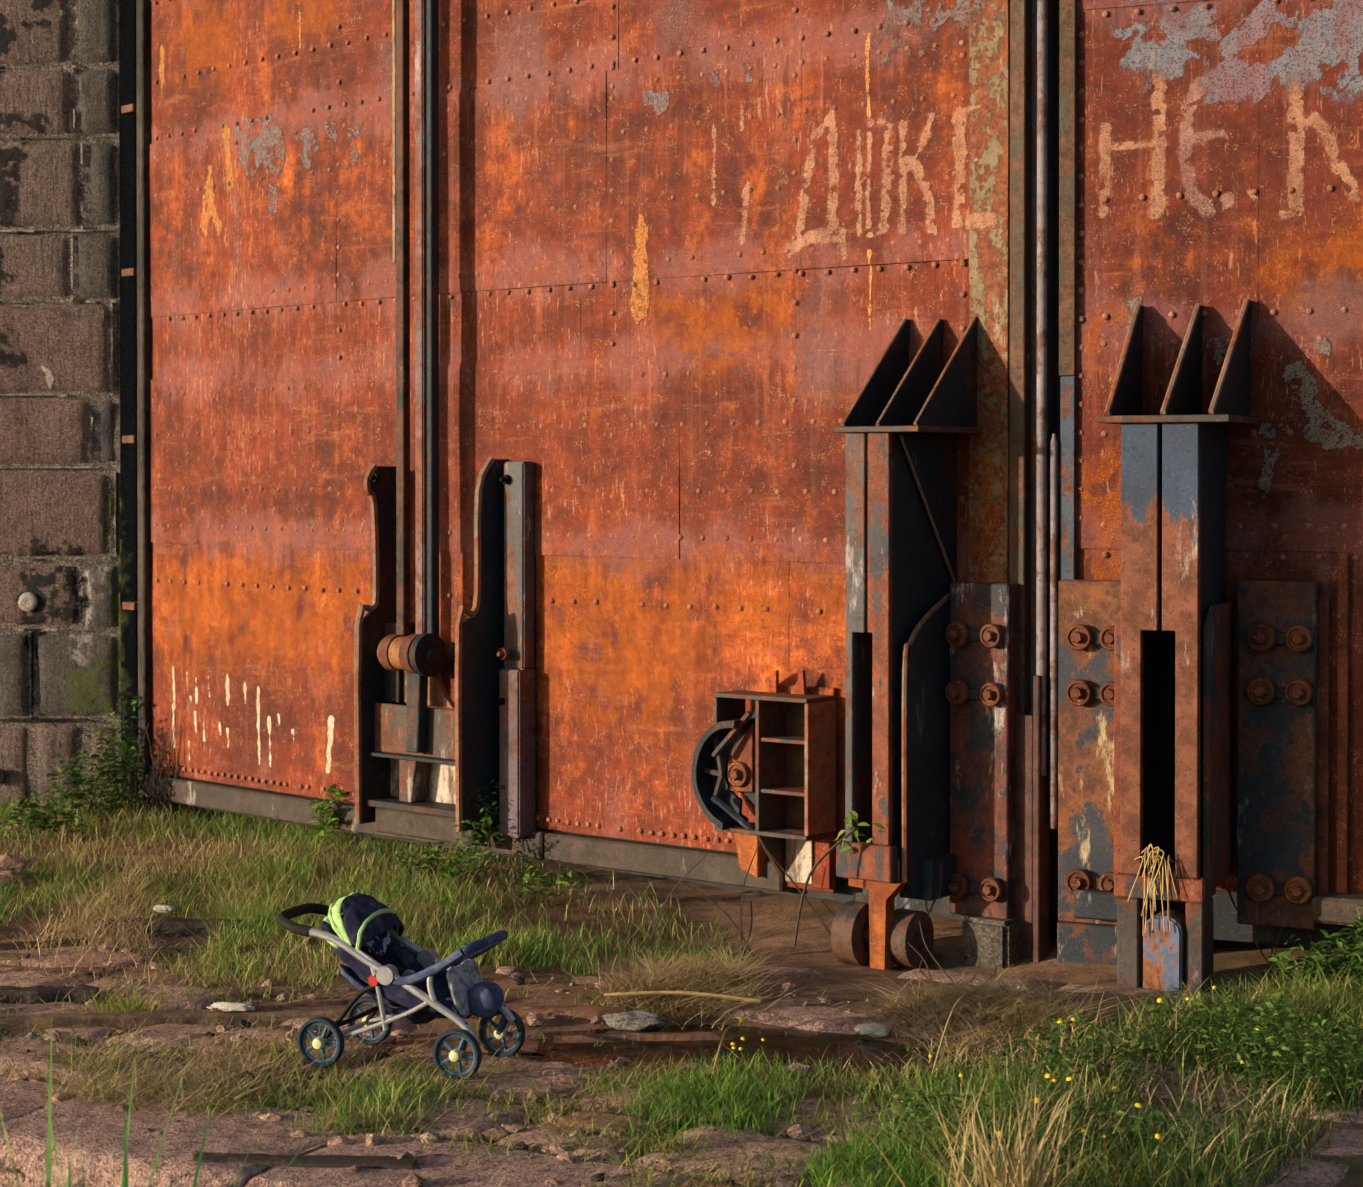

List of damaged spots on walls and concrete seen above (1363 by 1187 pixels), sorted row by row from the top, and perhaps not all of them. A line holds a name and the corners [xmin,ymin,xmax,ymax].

peeling [873,0,986,66]
peeling [1113,0,1363,105]
water stain [0,0,118,396]
peeling [200,114,362,237]
peeling [1253,422,1281,493]
peeling [1281,360,1363,452]
water stain [13,538,112,666]